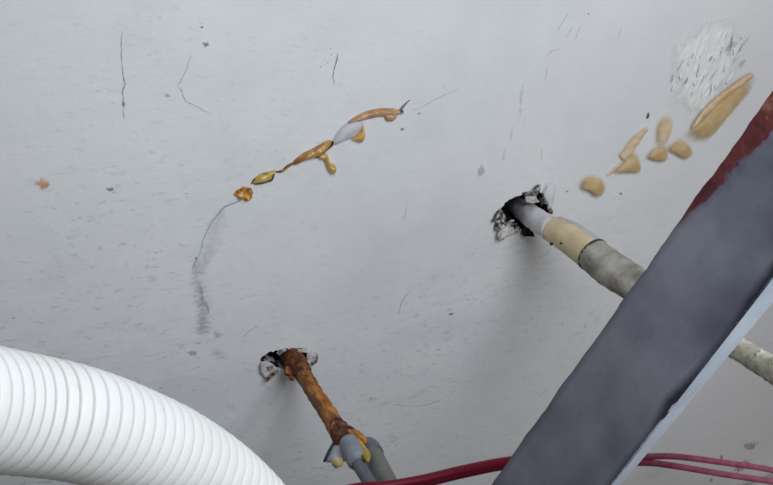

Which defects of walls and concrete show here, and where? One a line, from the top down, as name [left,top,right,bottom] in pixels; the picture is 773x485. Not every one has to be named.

crack [119,36,127,115]
spalling [518,183,555,214]
crack [192,201,238,271]
spalling [492,202,535,241]
spalling [260,348,318,382]